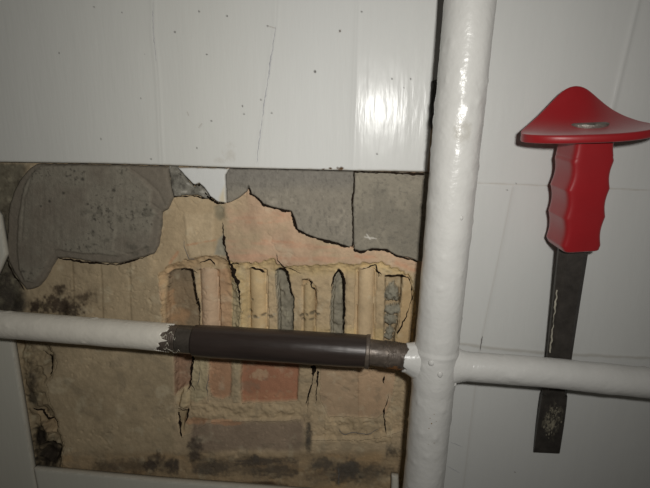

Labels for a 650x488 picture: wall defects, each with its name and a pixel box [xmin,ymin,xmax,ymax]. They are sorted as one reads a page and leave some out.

water stain [0,273,88,316]
crack [182,222,346,329]
spalling [158,255,417,343]
spalling [16,339,65,467]
crack [178,408,190,437]
spalling [161,331,410,441]
crack [306,365,319,412]
water stain [188,438,297,476]
water stain [313,459,378,484]